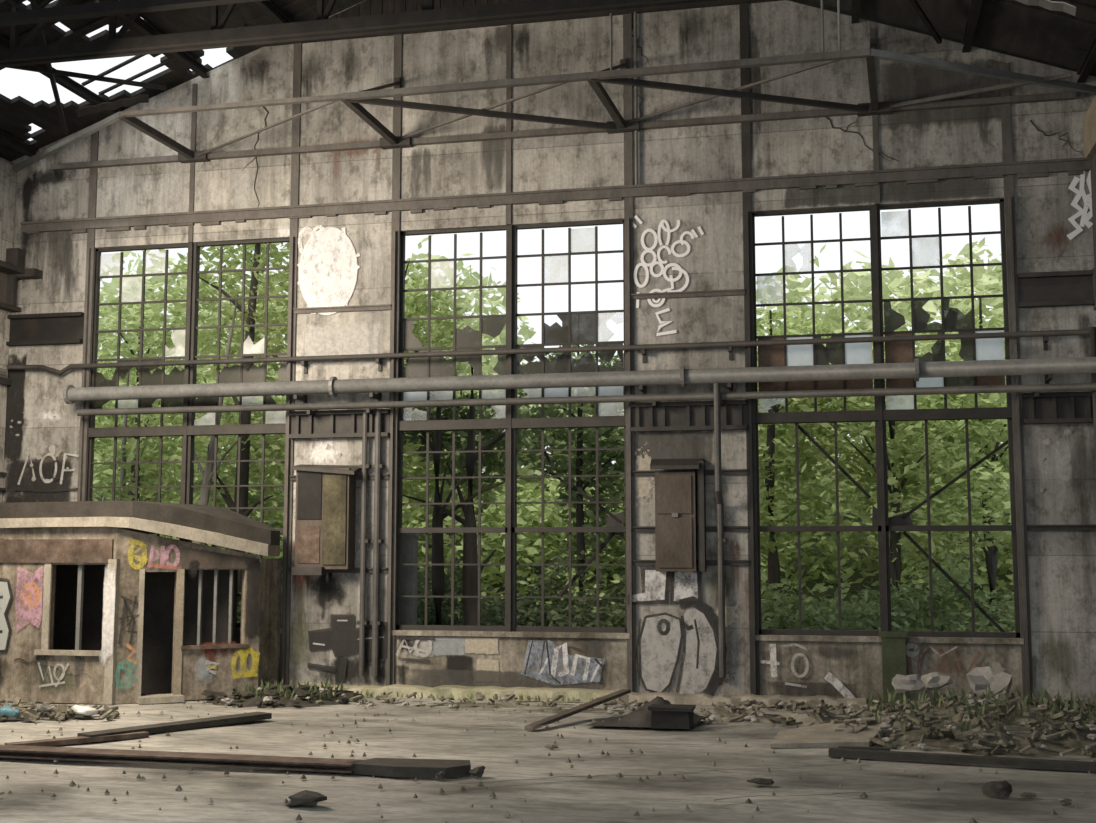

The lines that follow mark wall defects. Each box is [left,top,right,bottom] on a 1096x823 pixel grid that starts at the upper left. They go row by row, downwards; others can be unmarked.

water stain [411,150,430,194]
water stain [483,127,505,188]